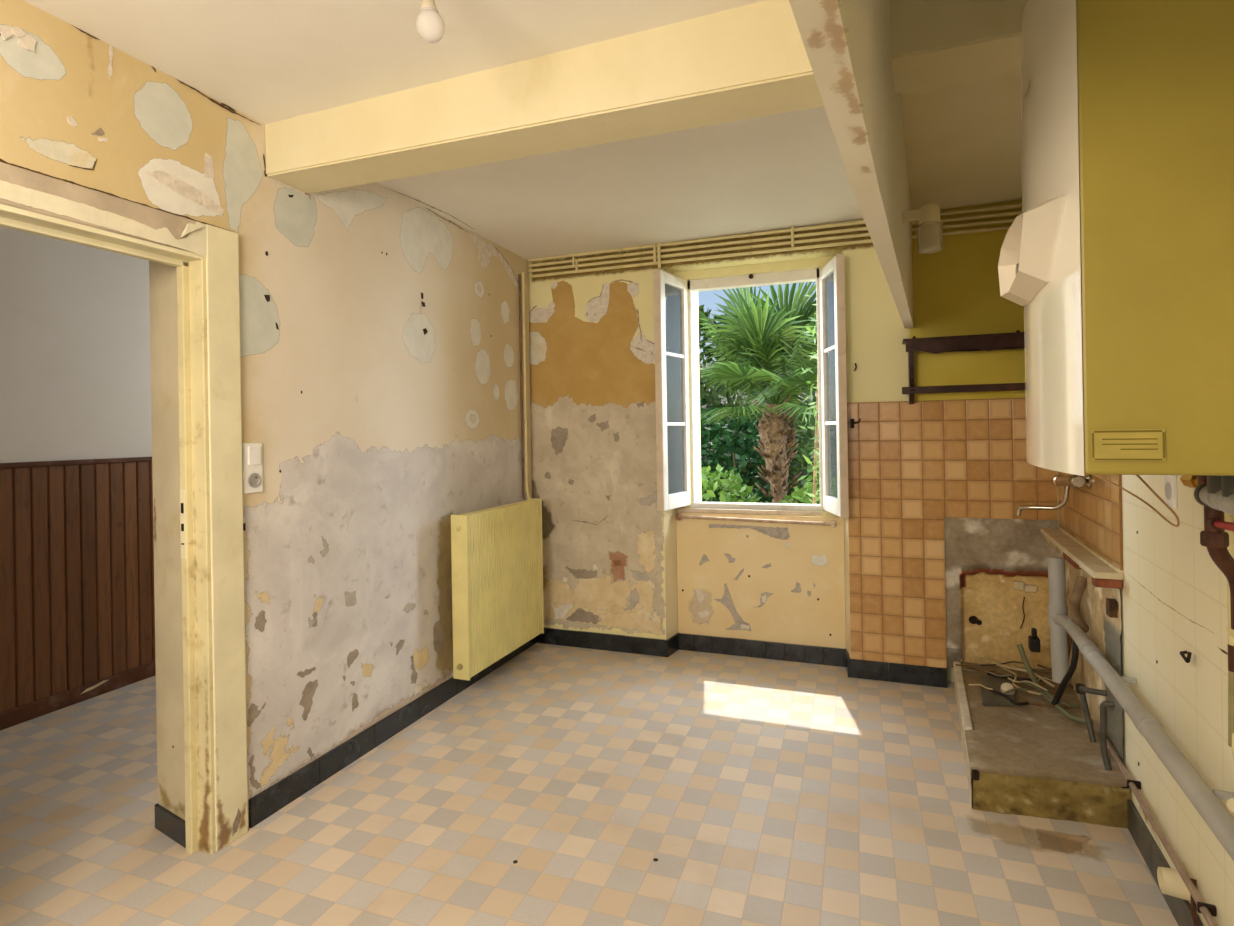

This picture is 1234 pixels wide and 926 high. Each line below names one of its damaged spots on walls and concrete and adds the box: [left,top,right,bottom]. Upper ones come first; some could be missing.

peeling [20,136,97,171]
peeling [0,153,224,257]
peeling [243,279,666,799]
peeling [708,524,791,548]
peeling [695,553,751,631]
spalling [944,517,1123,763]
crack [1130,575,1228,655]